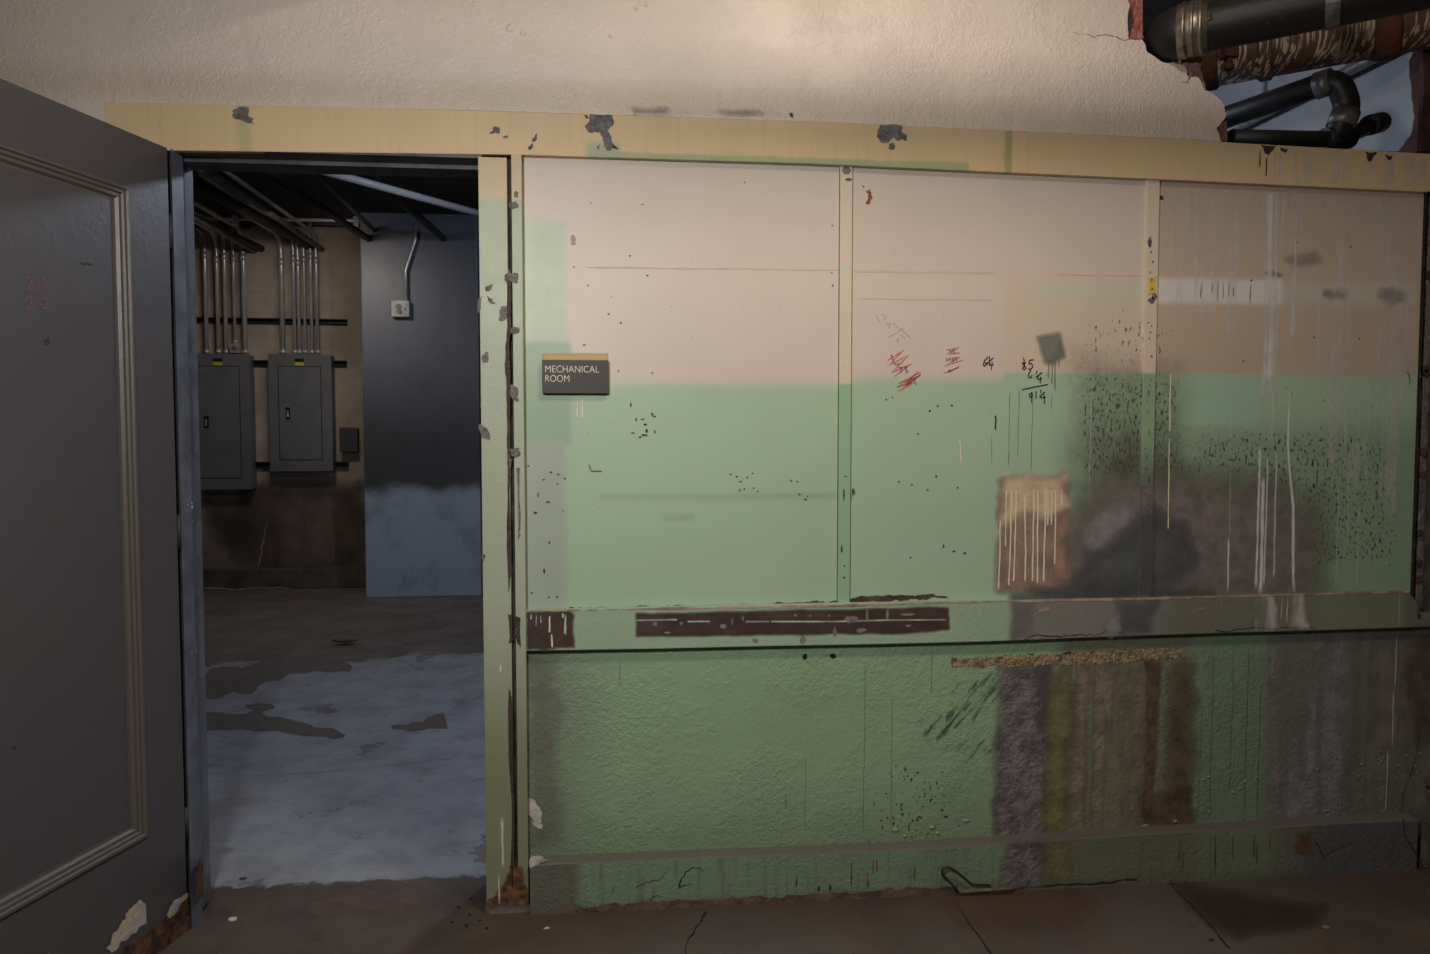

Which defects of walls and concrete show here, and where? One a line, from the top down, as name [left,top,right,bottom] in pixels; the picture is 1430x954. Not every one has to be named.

flaking render [1128,0,1143,40]
spalling [1417,49,1430,154]
peeling [481,269,566,593]
damp [1076,193,1402,627]
peeling [508,592,574,650]
peeling [636,607,949,643]
corrosion [106,857,204,954]
corrosion [486,821,530,914]
peeling [508,690,548,889]
damp [993,661,1193,888]
damp [1270,644,1348,819]
damp [1364,628,1430,817]